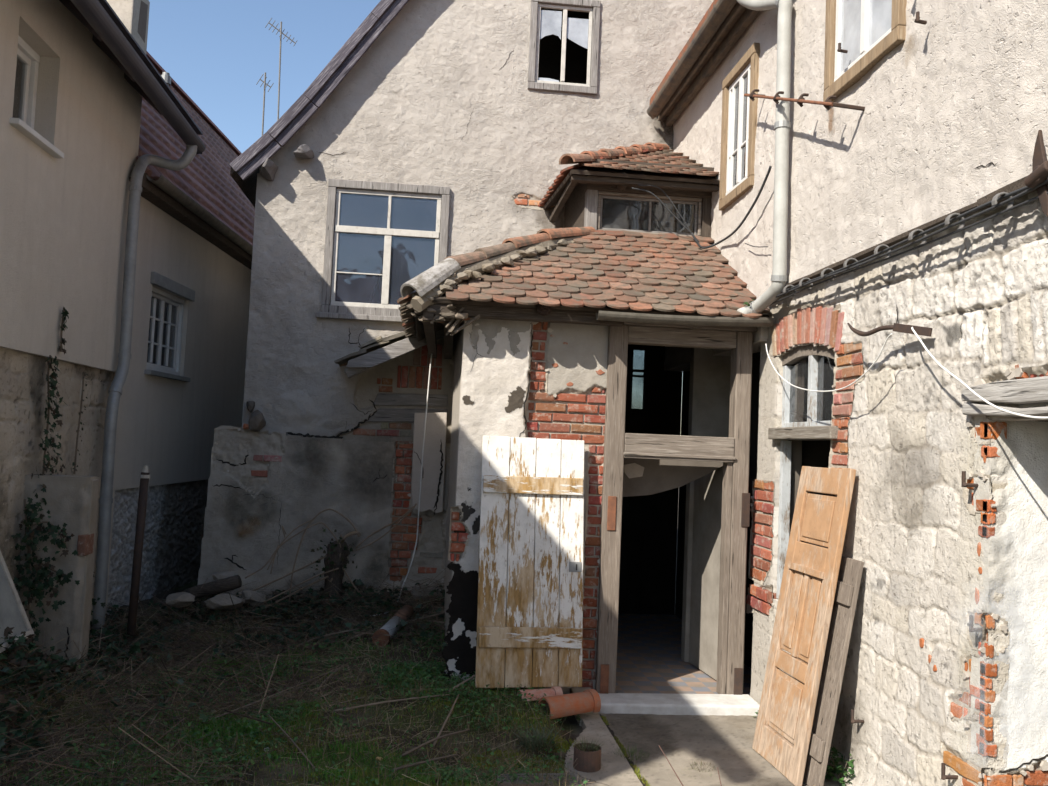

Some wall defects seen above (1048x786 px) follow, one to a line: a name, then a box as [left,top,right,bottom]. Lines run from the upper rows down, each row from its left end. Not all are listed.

flaking render [511,192,555,210]
crack [287,400,377,439]
flaking render [212,428,286,497]
flaking render [338,338,471,594]
flaking render [466,318,606,690]
flaking render [960,416,1007,574]
peeling [446,657,460,674]
peeling [451,618,477,648]
flaking render [940,588,1048,786]